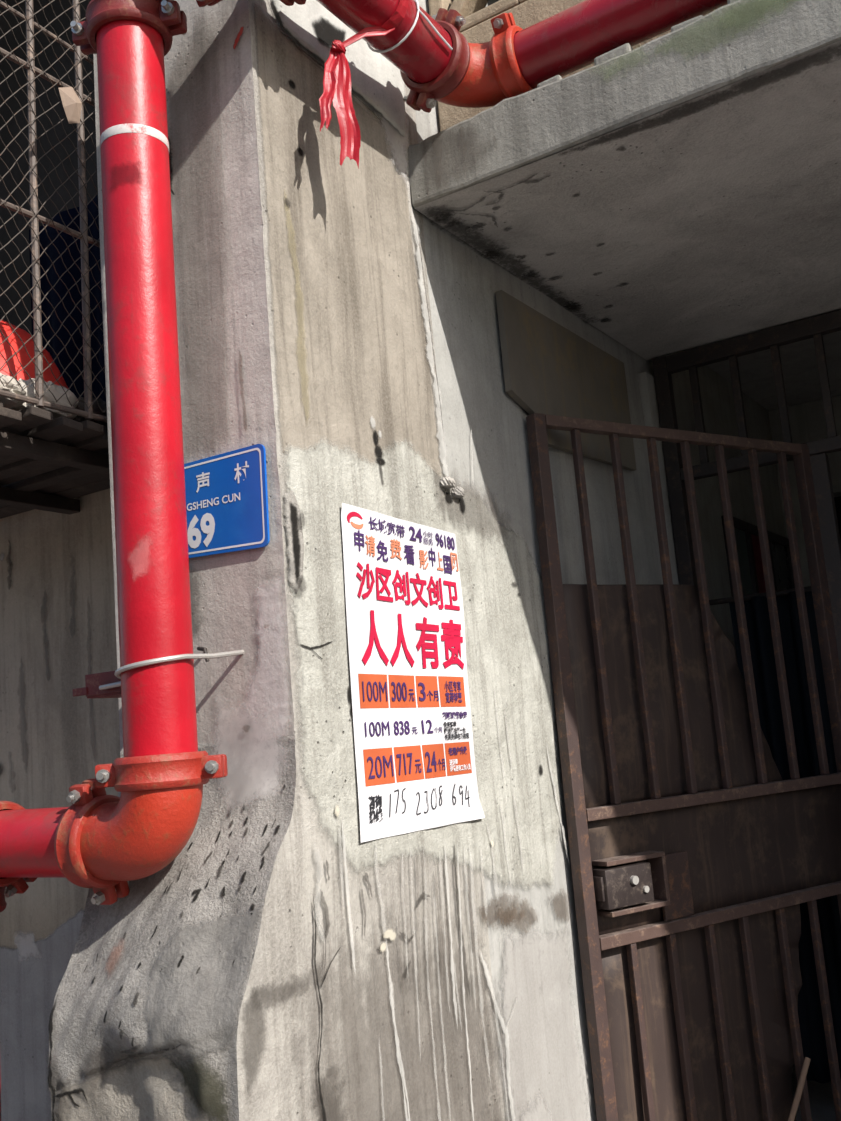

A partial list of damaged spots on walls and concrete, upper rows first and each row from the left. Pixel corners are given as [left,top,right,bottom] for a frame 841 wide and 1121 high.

leakage [561,44,841,155]
crack [417,175,550,425]
leakage [425,208,612,323]
crack [312,897,341,1121]
leakage [396,1032,410,1121]
leakage [445,846,474,1121]